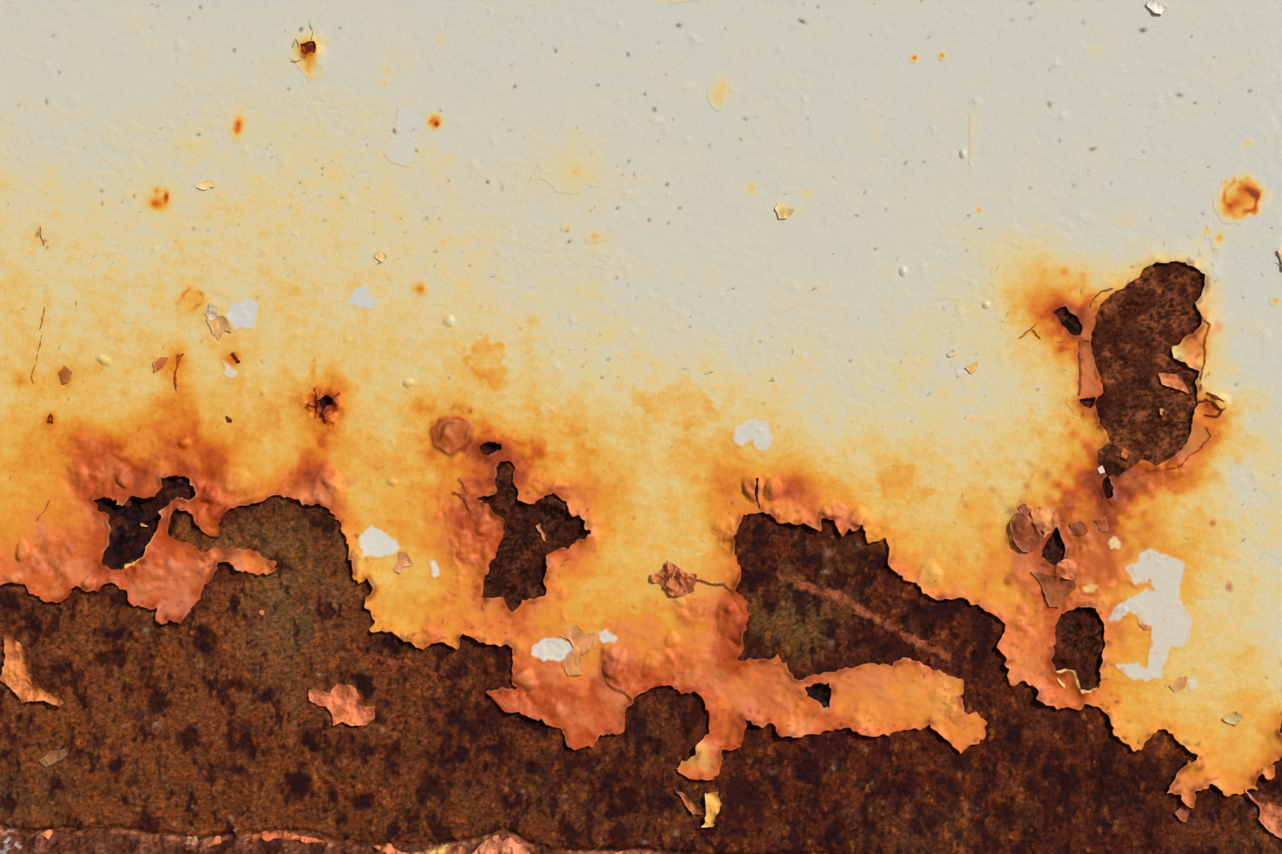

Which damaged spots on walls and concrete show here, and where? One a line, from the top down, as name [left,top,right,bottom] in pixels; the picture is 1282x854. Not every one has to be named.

rust [141,185,173,217]
rust [1205,171,1269,250]
rust [174,279,210,316]
rust [978,237,1119,377]
rust [221,350,243,367]
rust [280,366,358,467]
rust [414,393,514,492]
rust [456,329,515,399]
rust [620,369,728,437]
rust [1193,361,1249,448]
rust [1060,448,1166,543]
peeling [0,452,1282,854]